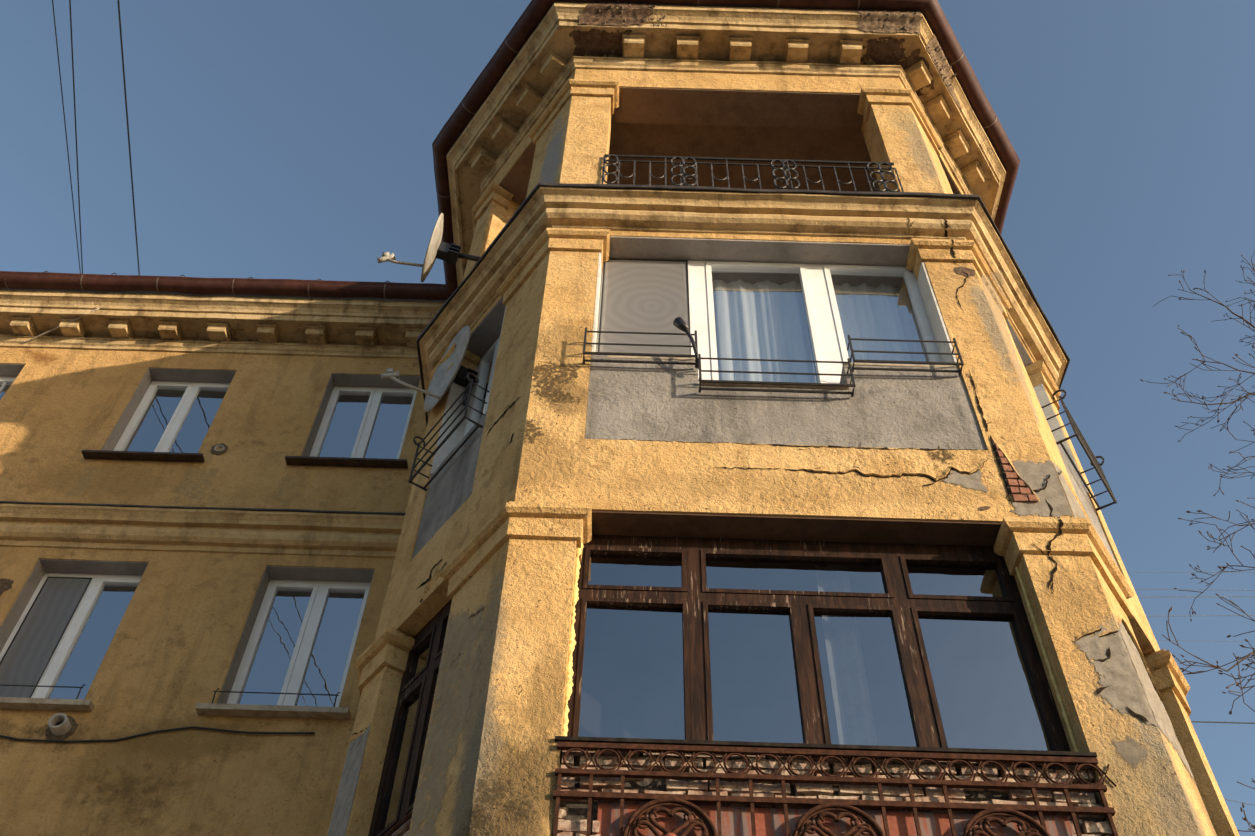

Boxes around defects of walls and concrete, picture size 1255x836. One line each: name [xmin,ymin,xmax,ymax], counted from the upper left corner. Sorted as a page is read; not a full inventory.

crack [898,206,968,310]
flaking render [531,358,581,410]
crack [718,370,991,486]
flaking render [926,450,991,510]
flaking render [990,435,1086,519]
crack [1032,465,1089,593]
flaking render [1072,615,1197,785]